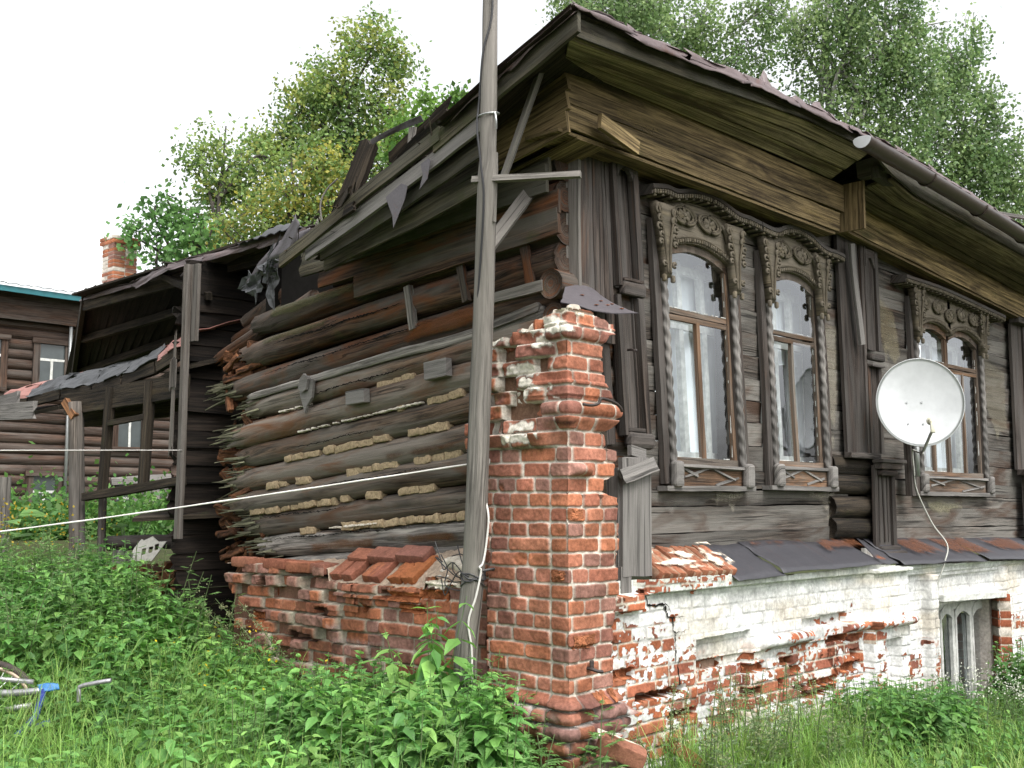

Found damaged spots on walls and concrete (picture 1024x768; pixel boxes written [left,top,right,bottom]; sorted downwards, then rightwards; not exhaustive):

corrosion [897,538,1023,552]
crack [645,595,685,685]
peeling [592,575,919,759]
peeling [901,640,941,689]